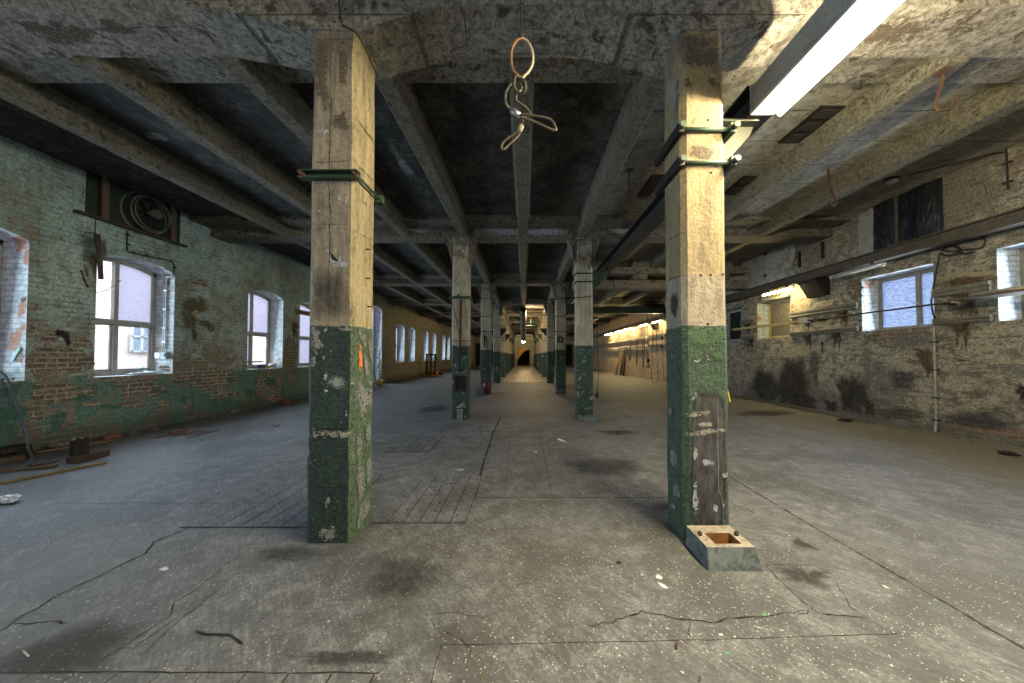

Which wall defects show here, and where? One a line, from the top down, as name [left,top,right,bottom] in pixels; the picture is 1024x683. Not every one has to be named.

rust [917,349,932,378]
peeling [308,326,383,524]
spalling [685,411,726,465]
peeling [319,526,337,542]
crack [0,503,218,631]
crack [587,564,883,637]
crack [426,612,486,667]